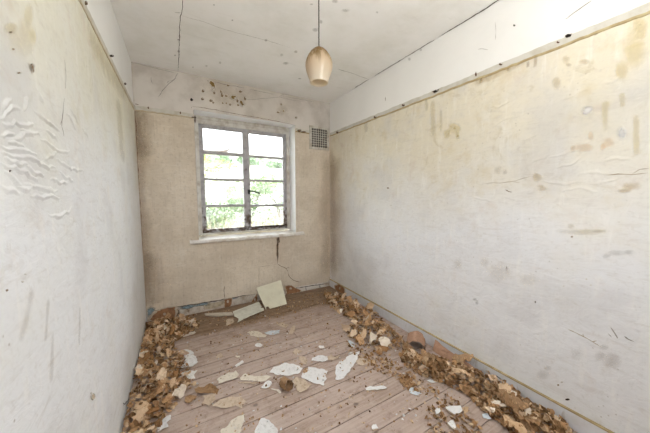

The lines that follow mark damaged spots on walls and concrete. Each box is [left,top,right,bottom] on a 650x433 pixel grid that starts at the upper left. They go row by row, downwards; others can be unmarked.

crack [135,0,290,97]
flaking render [284,285,302,295]